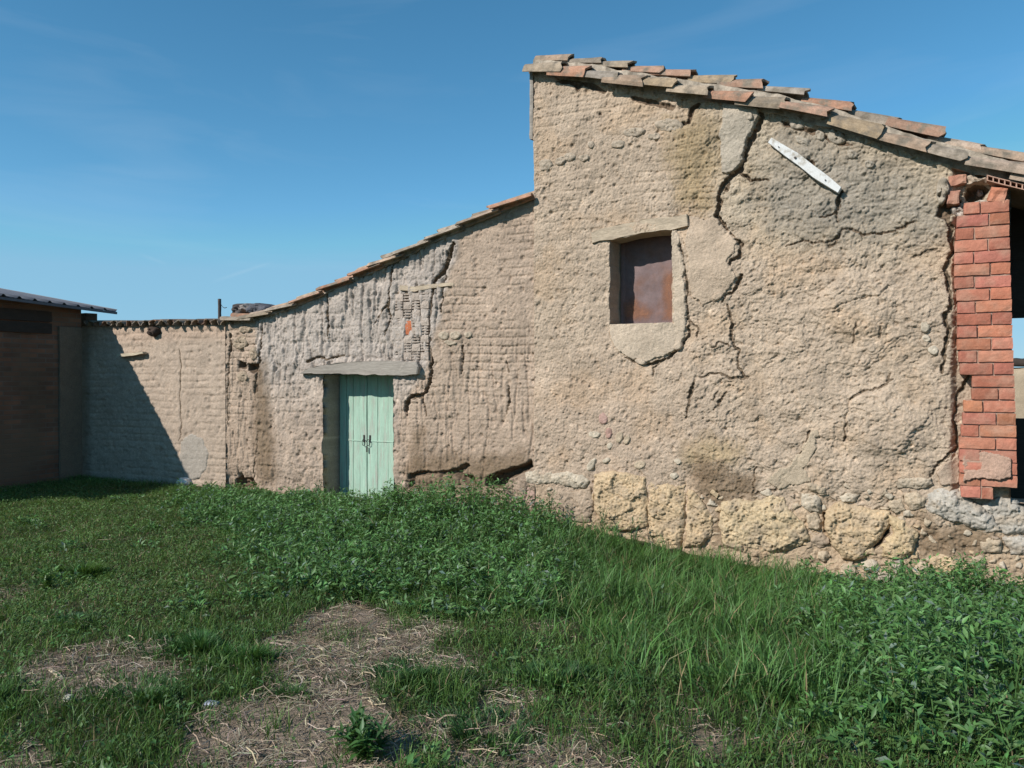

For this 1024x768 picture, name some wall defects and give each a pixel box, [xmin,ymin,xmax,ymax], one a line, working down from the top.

crack [404,242,456,416]
crack [625,111,770,419]
crack [786,190,915,248]
crack [913,217,970,477]